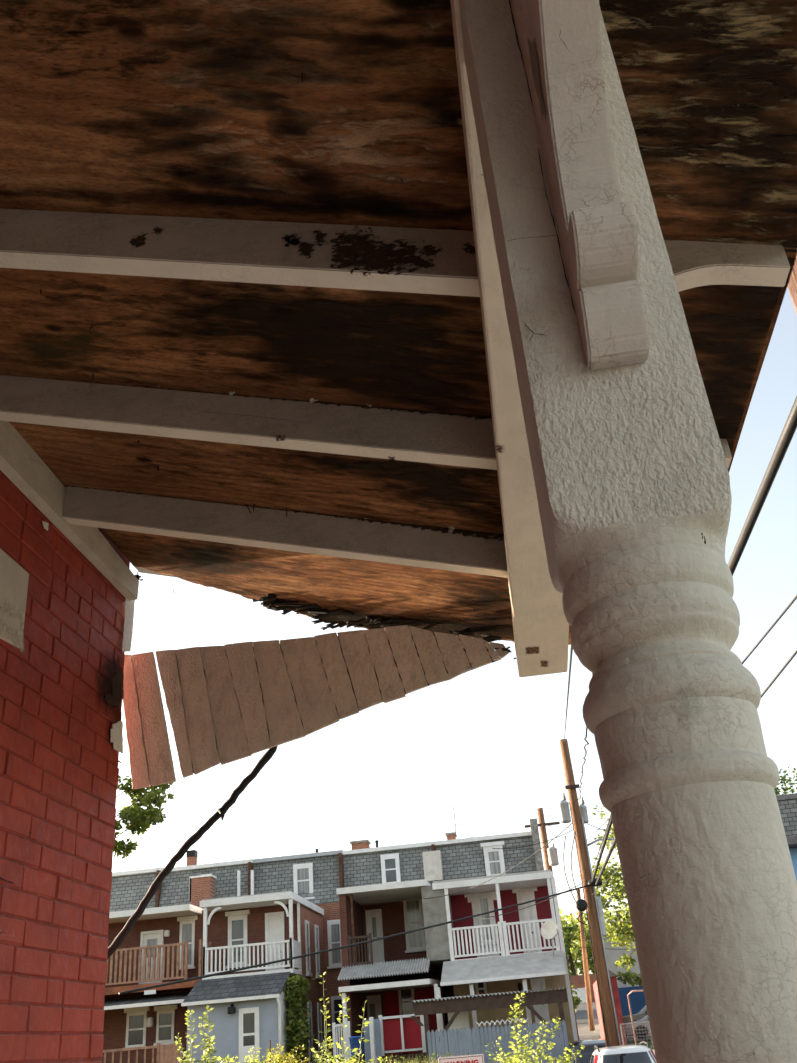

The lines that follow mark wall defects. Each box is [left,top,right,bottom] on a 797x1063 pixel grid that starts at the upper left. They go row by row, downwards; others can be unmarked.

water stain [95,0,472,219]
peeling [129,227,163,248]
peeling [282,225,444,277]
water stain [599,0,797,452]
water stain [14,280,490,414]
water stain [246,450,504,536]
water stain [113,534,377,592]
water stain [444,574,513,635]